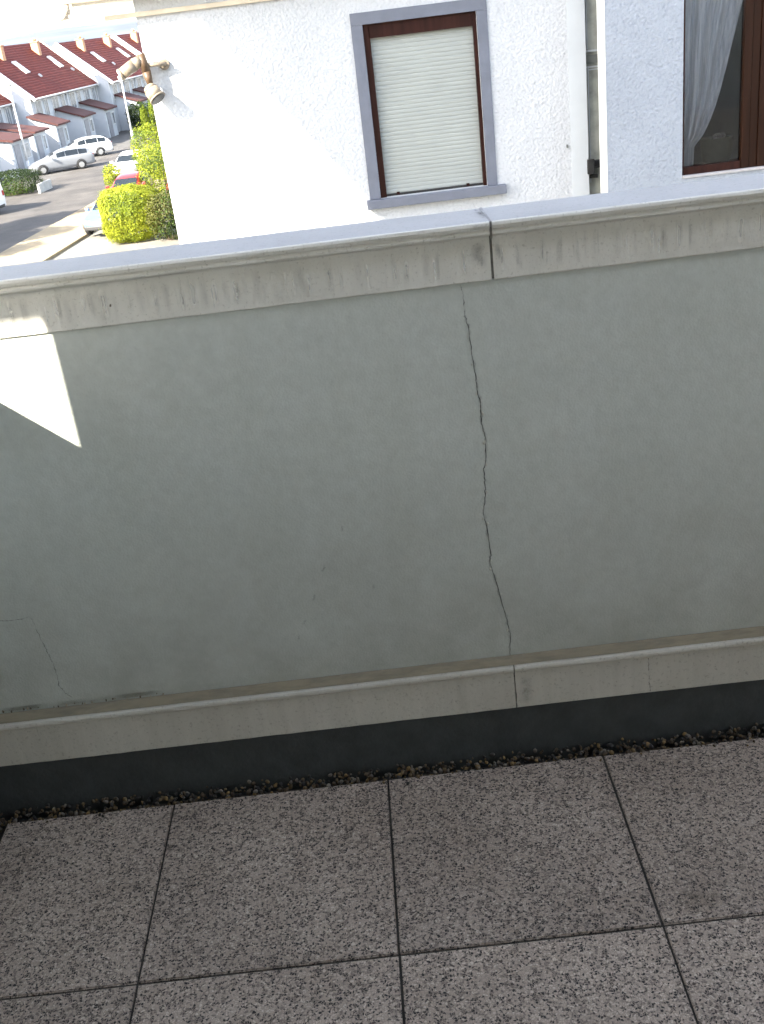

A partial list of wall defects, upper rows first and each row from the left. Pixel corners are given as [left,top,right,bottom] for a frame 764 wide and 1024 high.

crack [461,289,517,701]